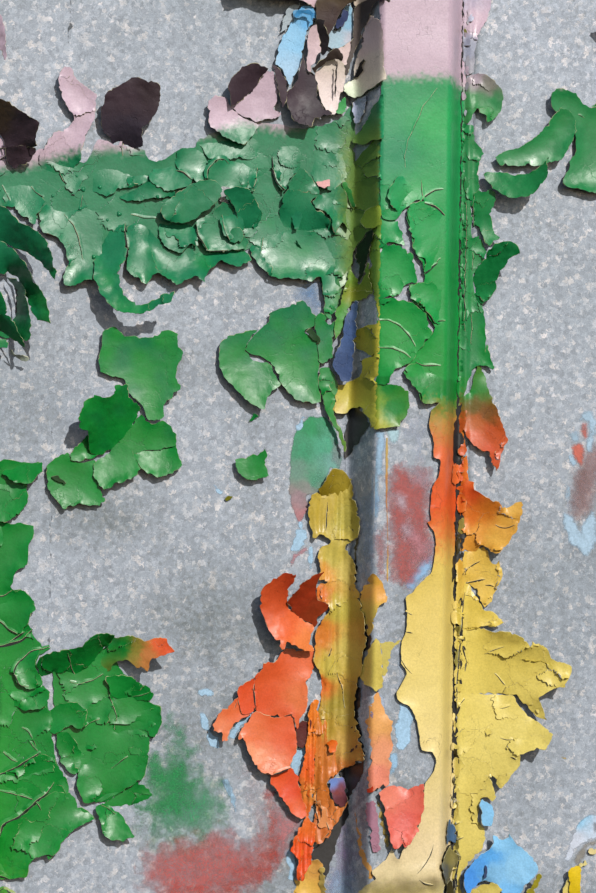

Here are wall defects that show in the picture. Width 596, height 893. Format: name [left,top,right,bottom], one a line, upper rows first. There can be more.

peeling [0,67,385,452]
peeling [207,0,596,893]
crack [378,318,441,366]
crack [403,87,476,343]
crack [0,727,54,836]
crack [0,619,149,730]
peeling [0,327,183,893]